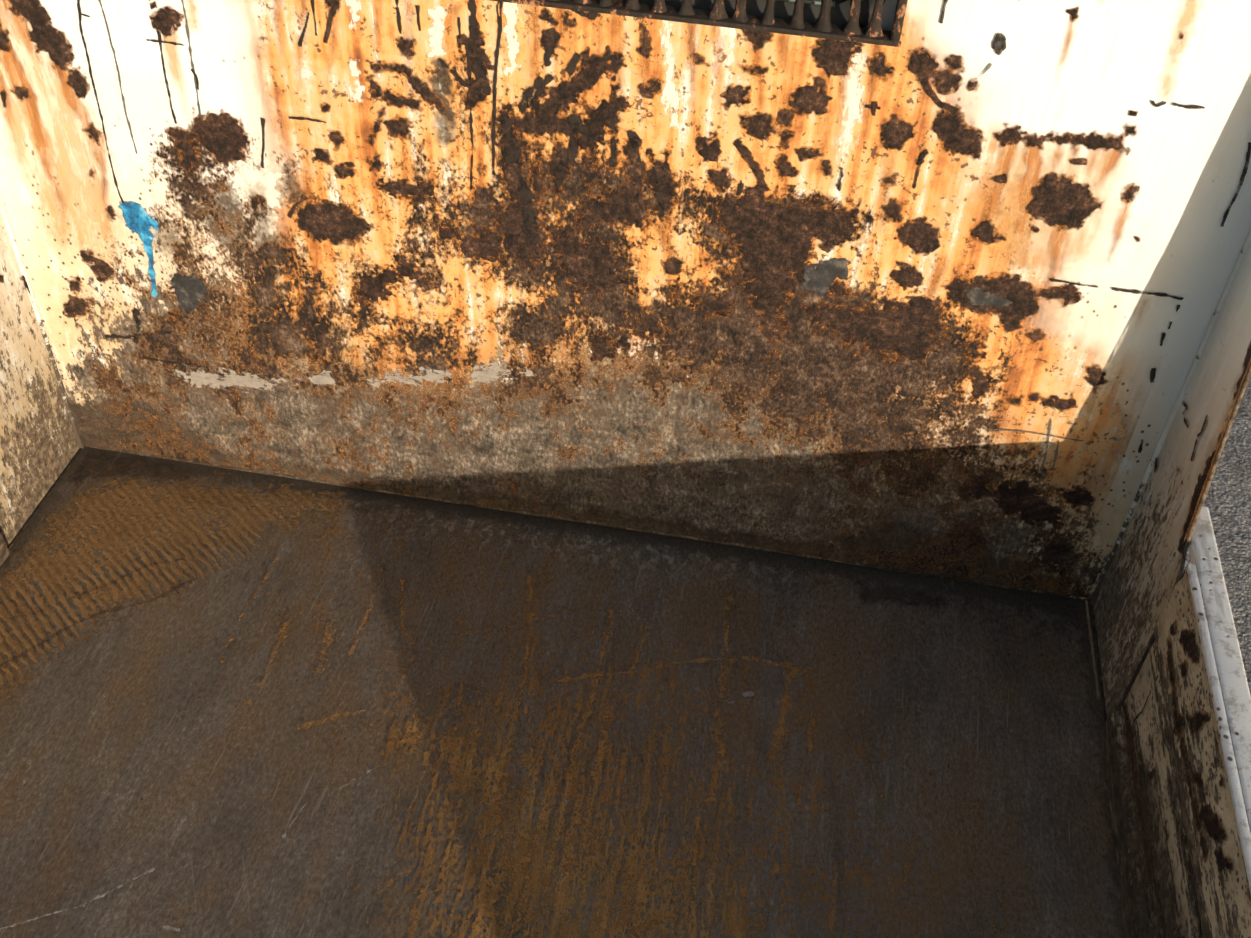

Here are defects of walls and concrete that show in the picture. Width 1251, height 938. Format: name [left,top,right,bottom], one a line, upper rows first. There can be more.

corrosion [0,0,109,243]
corrosion [257,0,1138,490]
corrosion [0,467,1039,938]